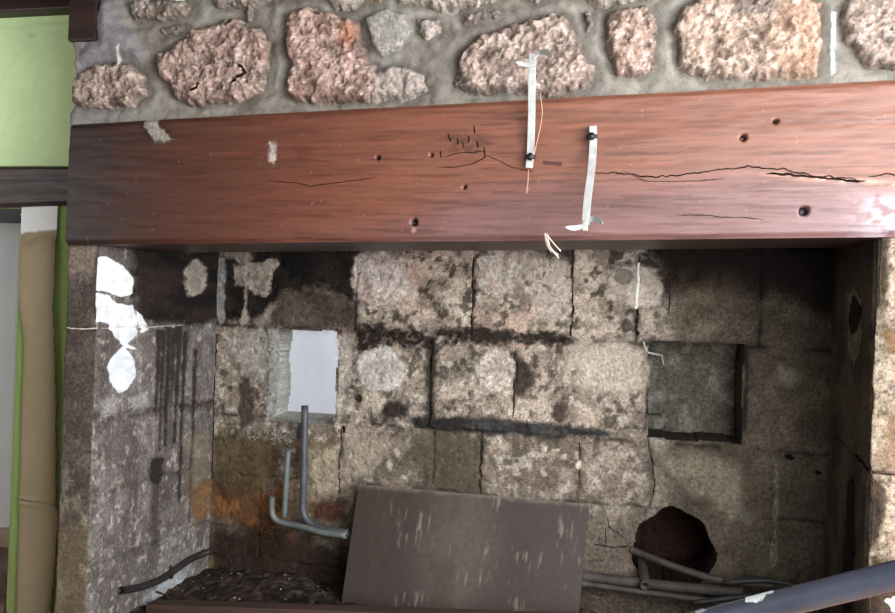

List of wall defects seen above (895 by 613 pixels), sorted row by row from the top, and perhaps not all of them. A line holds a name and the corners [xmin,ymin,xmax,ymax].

crack [440,151,531,172]
crack [267,177,376,187]
crack [595,165,895,183]
crack [683,213,762,221]
peeling [95,256,149,393]
spalling [846,285,862,369]
damp [98,326,296,544]
crack [855,454,895,475]
rust [187,480,284,566]